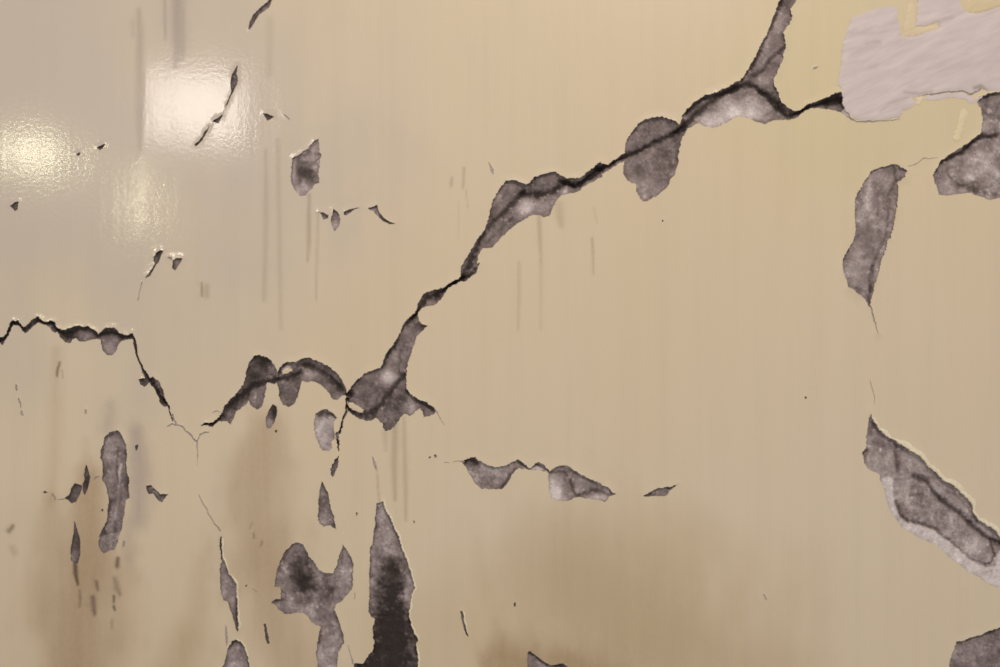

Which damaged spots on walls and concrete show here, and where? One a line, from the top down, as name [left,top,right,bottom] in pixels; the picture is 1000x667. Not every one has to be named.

peeling [189,62,242,148]
peeling [285,132,403,234]
crack [0,0,982,531]
peeling [826,89,1000,343]
peeling [39,423,174,566]
peeling [309,402,341,454]
peeling [454,449,623,507]
peeling [852,400,1000,598]
peeling [213,530,256,667]
peeling [260,475,427,667]
peeling [943,618,1000,667]